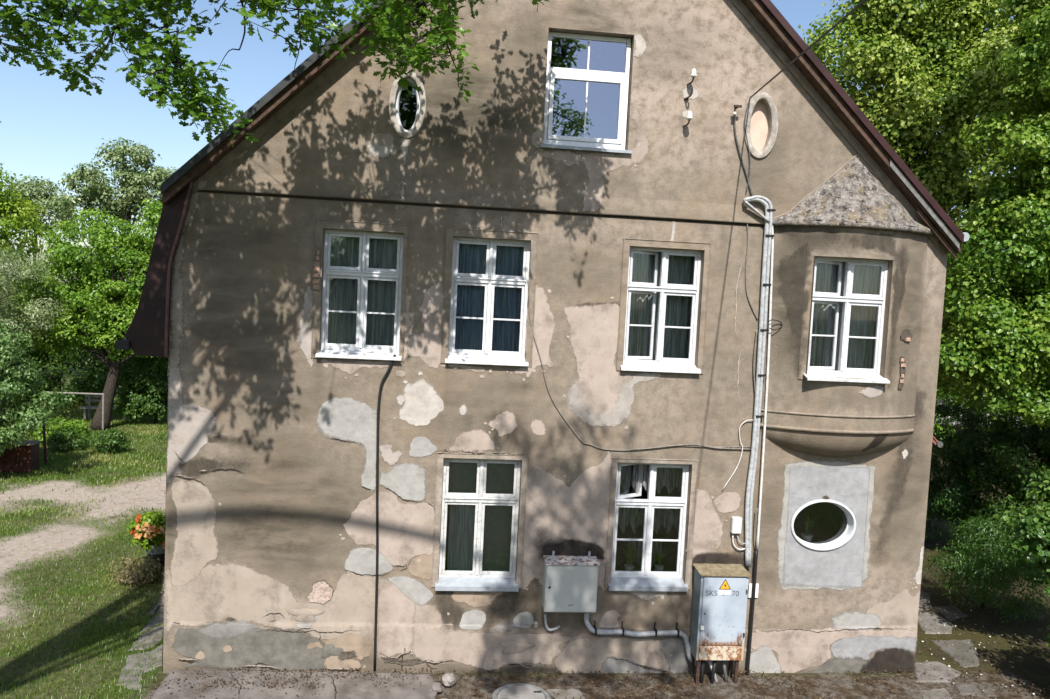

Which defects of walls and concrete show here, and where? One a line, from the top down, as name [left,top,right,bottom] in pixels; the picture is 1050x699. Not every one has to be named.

peeling [531,105,649,212]
peeling [321,281,492,384]
peeling [506,272,635,429]
peeling [163,480,672,673]
peeling [744,546,924,673]
leakage [860,648,915,673]